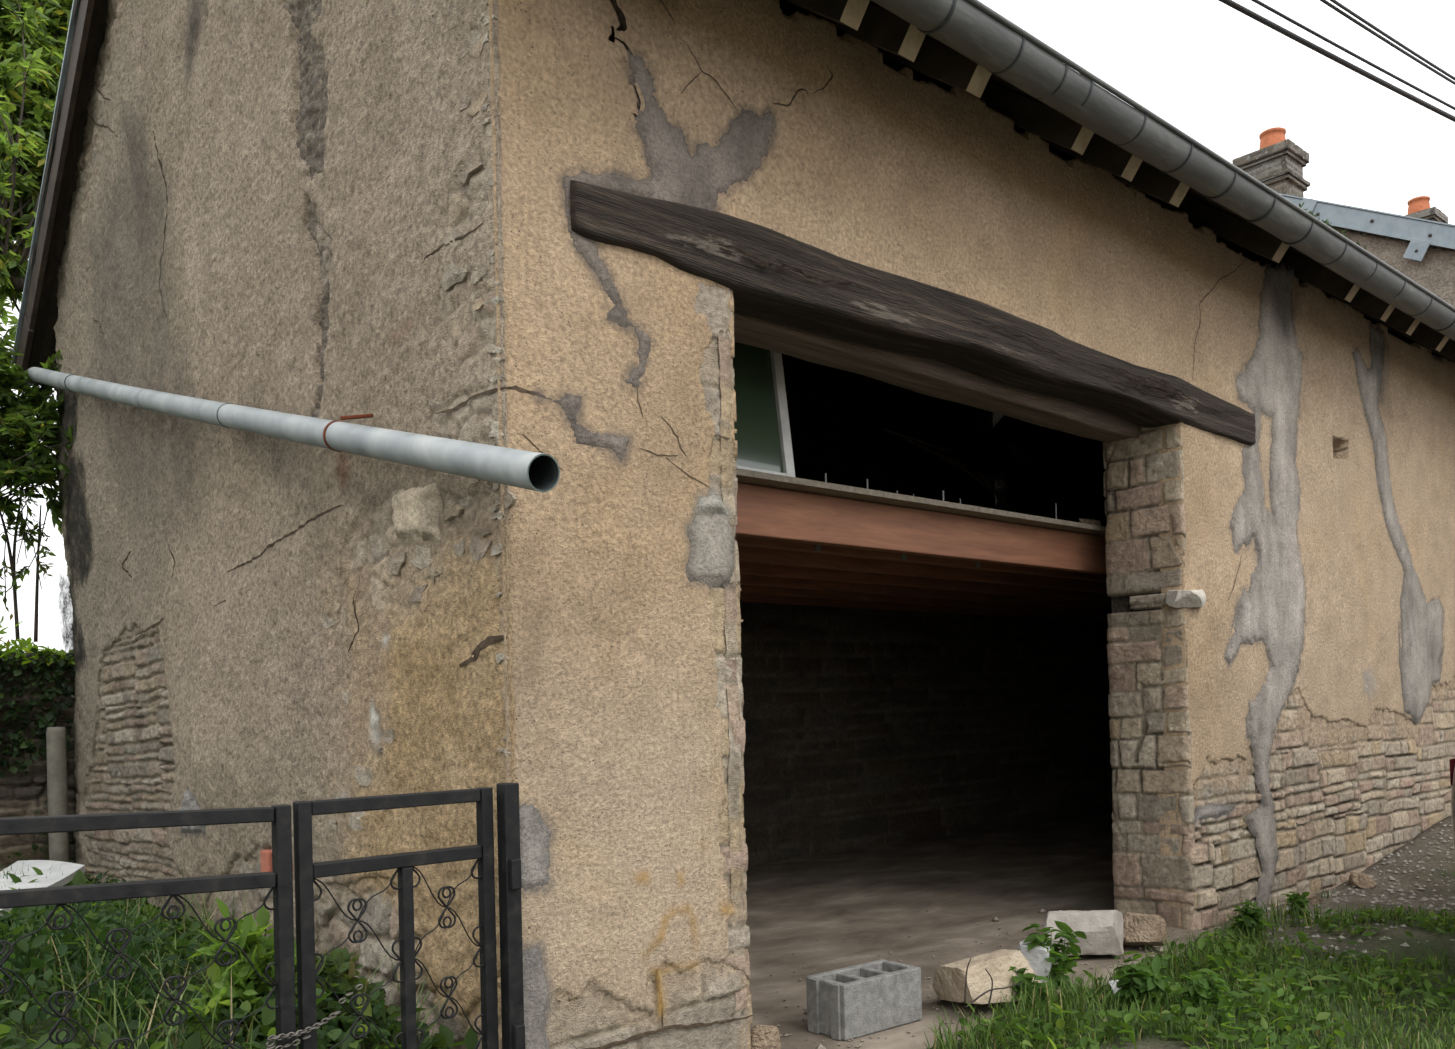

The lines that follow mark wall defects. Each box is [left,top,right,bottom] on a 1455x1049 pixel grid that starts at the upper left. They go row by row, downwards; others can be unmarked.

crack [607,0,738,115]
crack [773,66,833,107]
crack [214,505,342,606]
crack [135,617,165,636]
crack [348,576,360,652]
flaking render [544,283,781,1049]
flaking render [83,625,182,883]
flaking render [1180,676,1455,931]